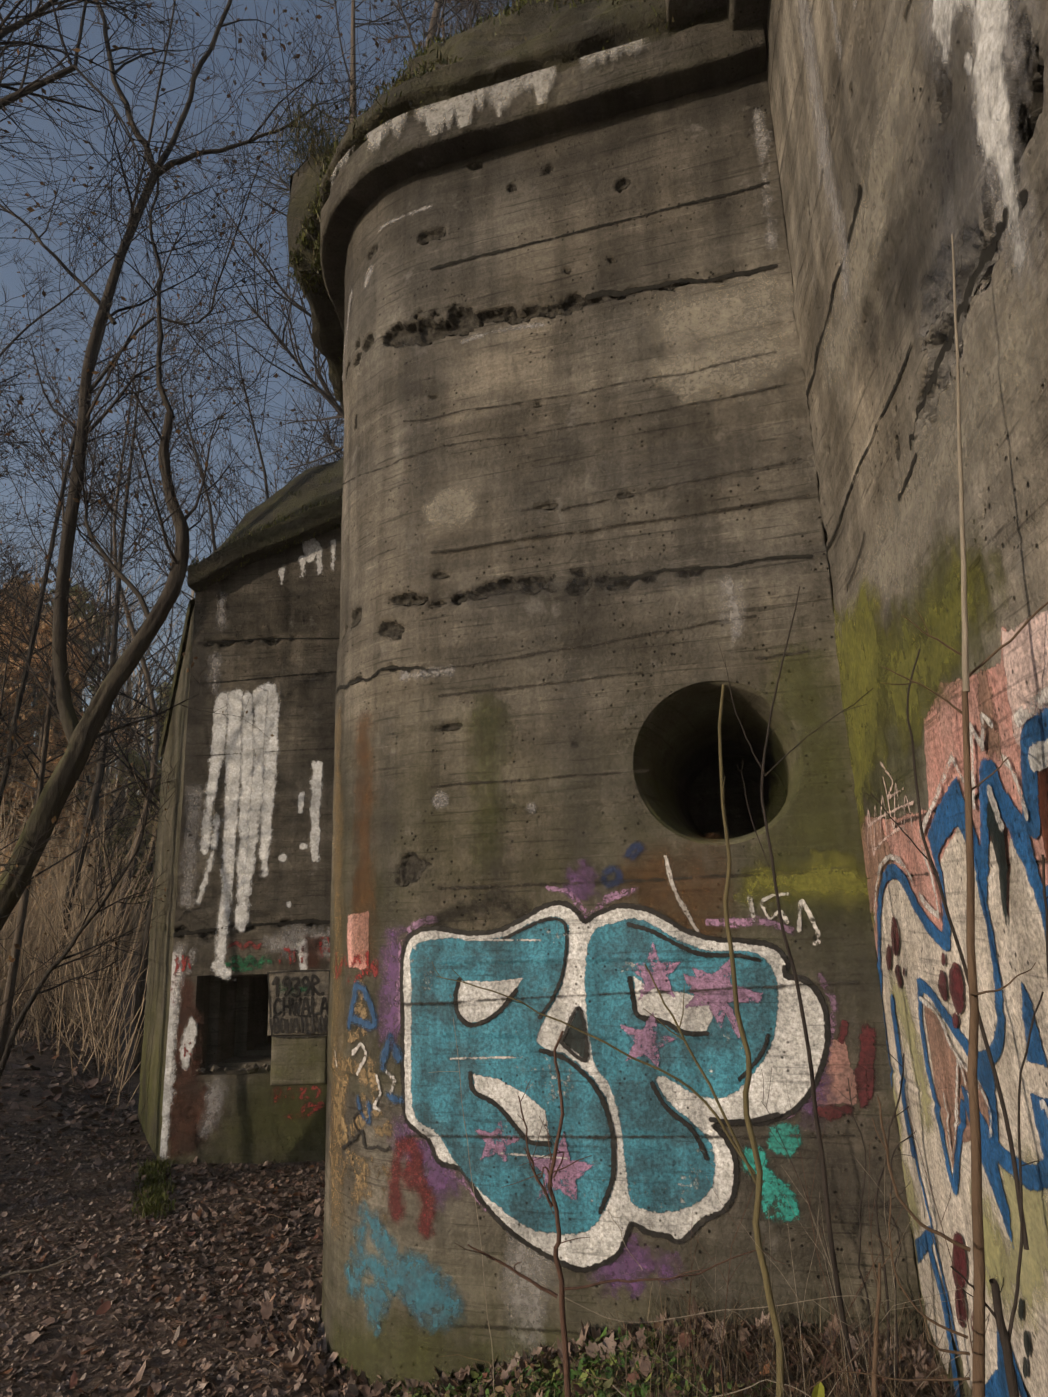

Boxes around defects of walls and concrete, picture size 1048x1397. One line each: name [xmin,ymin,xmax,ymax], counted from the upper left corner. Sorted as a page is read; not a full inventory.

spalling [616,177,631,193]
leakage [798,0,1030,385]
spalling [346,282,690,379]
crack [609,188,1028,588]
crack [431,458,810,554]
spalling [343,608,362,639]
crack [197,615,757,698]
spalling [378,569,657,640]
leakage [734,317,1035,930]
spalling [435,723,463,731]
spalling [393,852,430,887]